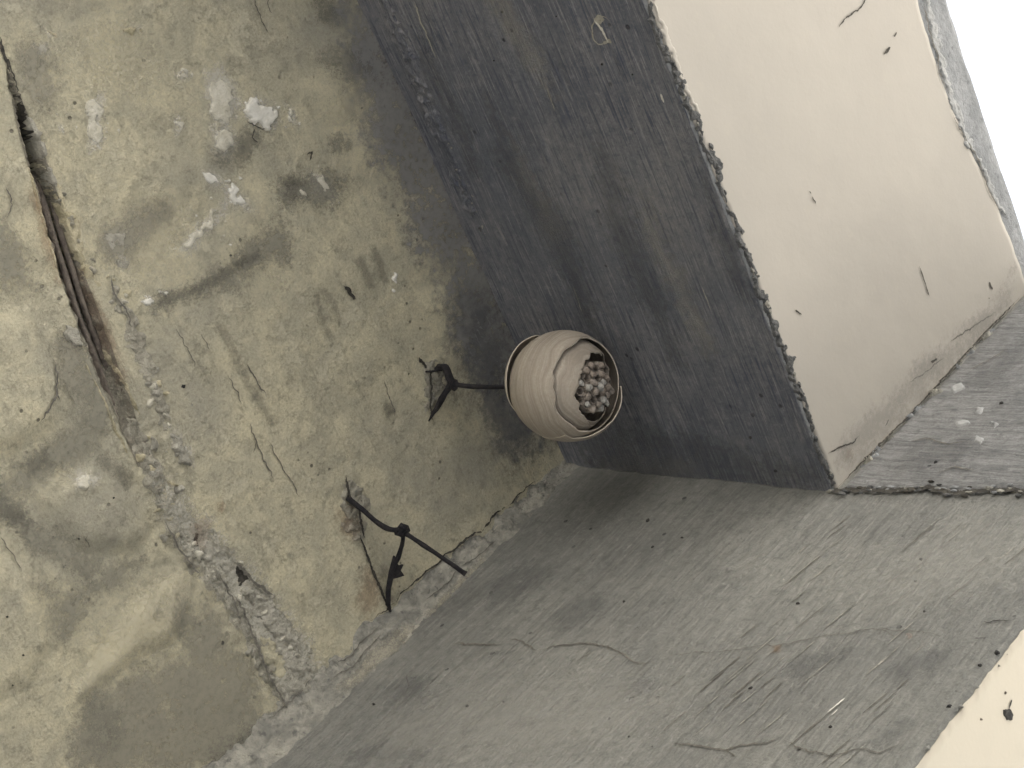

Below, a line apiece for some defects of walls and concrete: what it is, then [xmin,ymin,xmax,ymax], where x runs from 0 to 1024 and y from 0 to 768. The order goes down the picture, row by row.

peeling [208,78,305,153]
water stain [277,167,347,209]
peeling [311,164,329,192]
water stain [322,0,543,462]
crack [42,360,60,420]
flaking render [24,122,324,708]
flaking render [340,477,391,614]